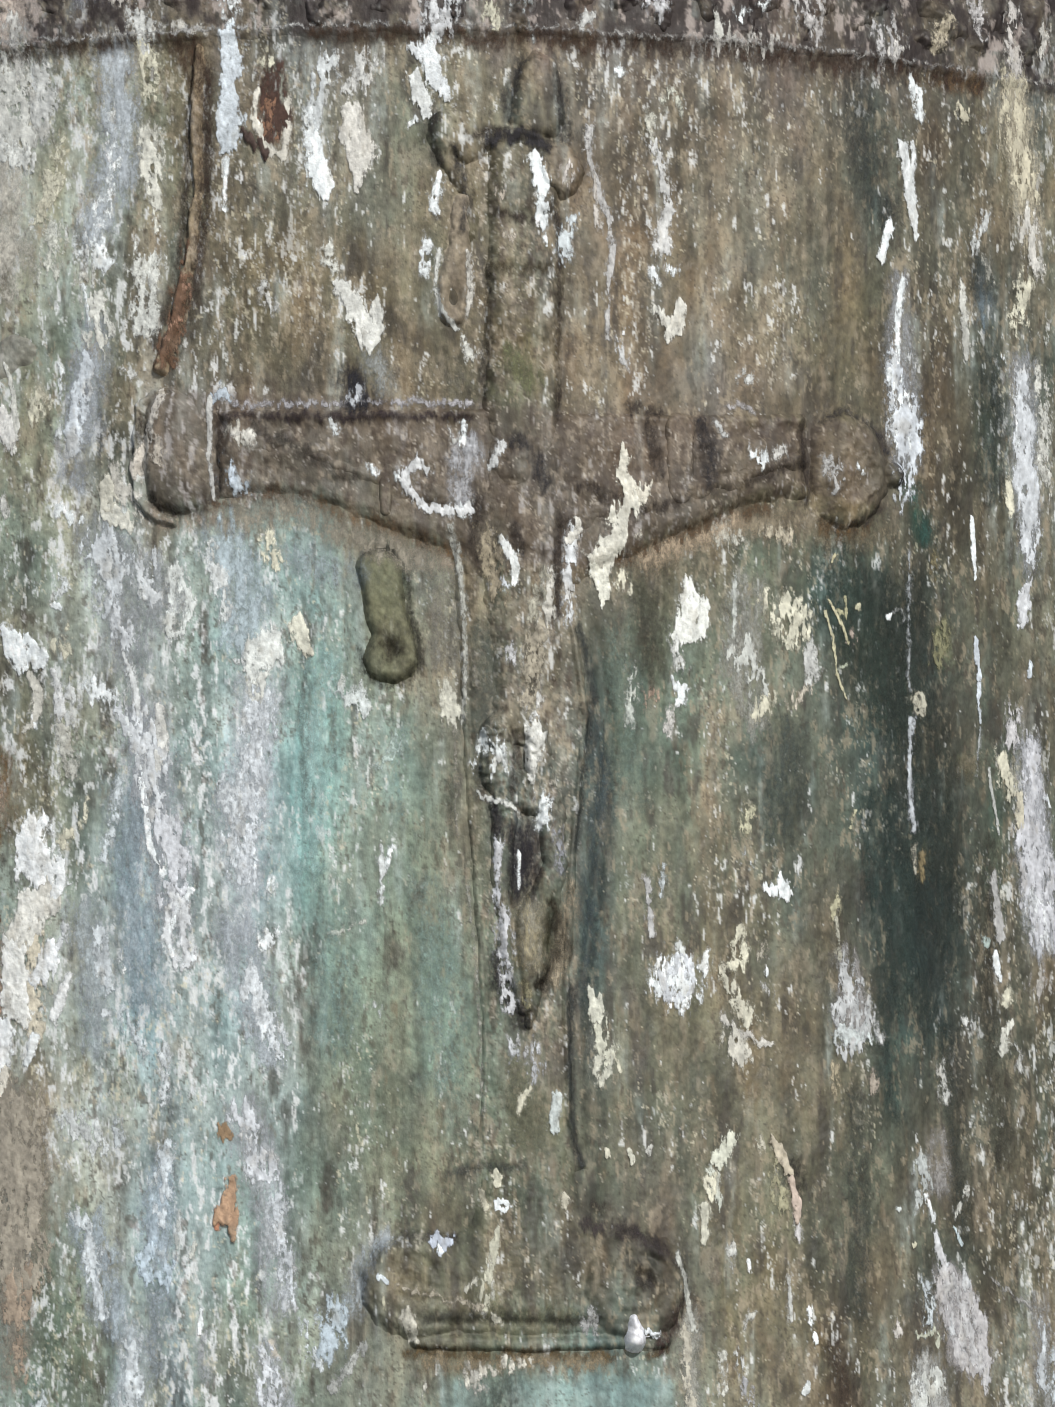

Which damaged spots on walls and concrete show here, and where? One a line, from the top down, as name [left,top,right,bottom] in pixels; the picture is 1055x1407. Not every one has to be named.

rust [240,48,293,164]
rust [153,163,209,369]
peeling [649,940,709,1015]
leakage [991,1277,1055,1407]